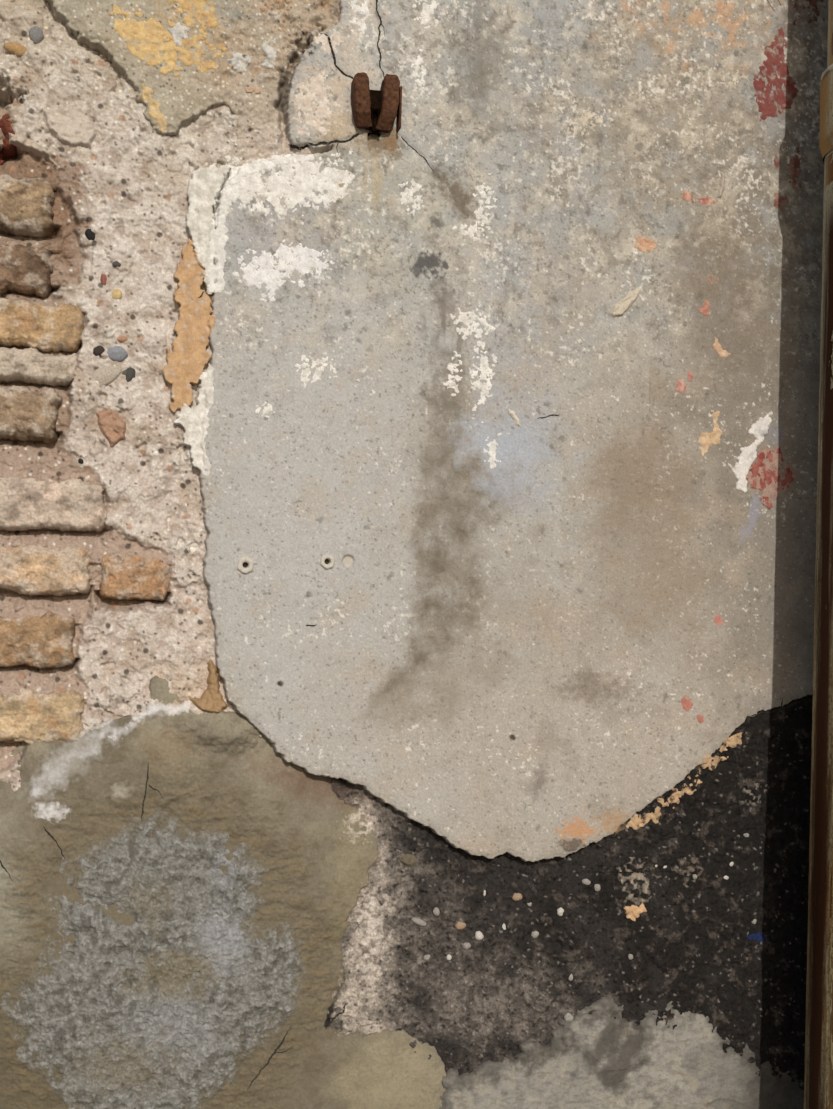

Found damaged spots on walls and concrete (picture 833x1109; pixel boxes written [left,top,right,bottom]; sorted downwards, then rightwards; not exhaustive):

crack [319,31,353,79]
peeling [313,0,371,54]
crack [376,0,385,76]
peeling [411,49,427,90]
peeling [412,0,439,29]
peeling [722,0,825,122]
crack [288,133,359,154]
peeling [564,107,614,136]
spalling [0,0,355,792]
water stain [350,248,736,733]
peeling [728,411,797,510]
spalling [325,695,813,1090]